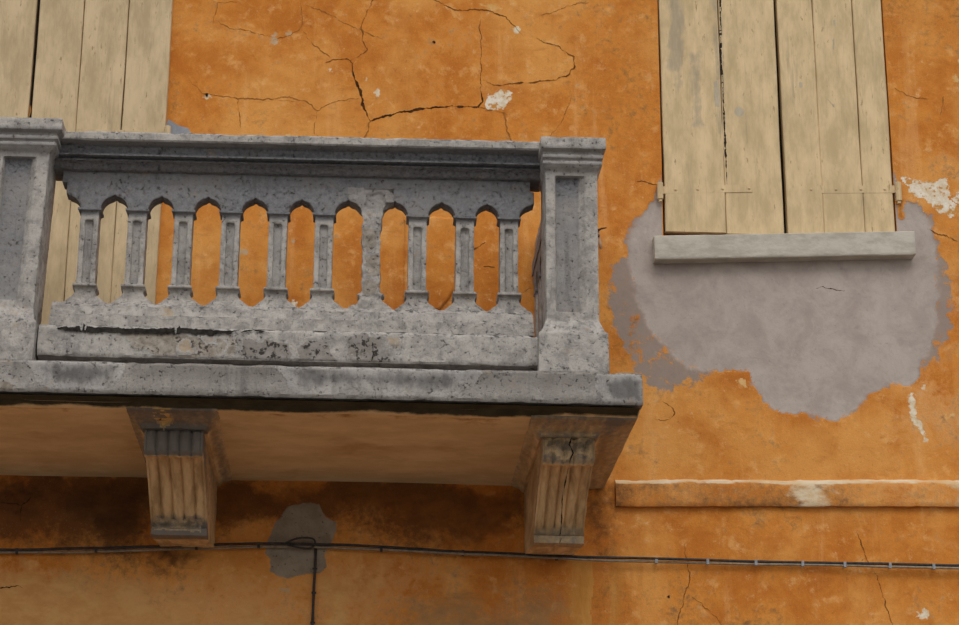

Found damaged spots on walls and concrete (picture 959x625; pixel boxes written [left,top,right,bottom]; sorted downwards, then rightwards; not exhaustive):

flaking render [166,118,192,134]
crack [192,0,576,141]
flaking render [599,162,959,444]
leakage [0,475,638,625]
crack [677,552,721,625]
crack [856,531,893,625]